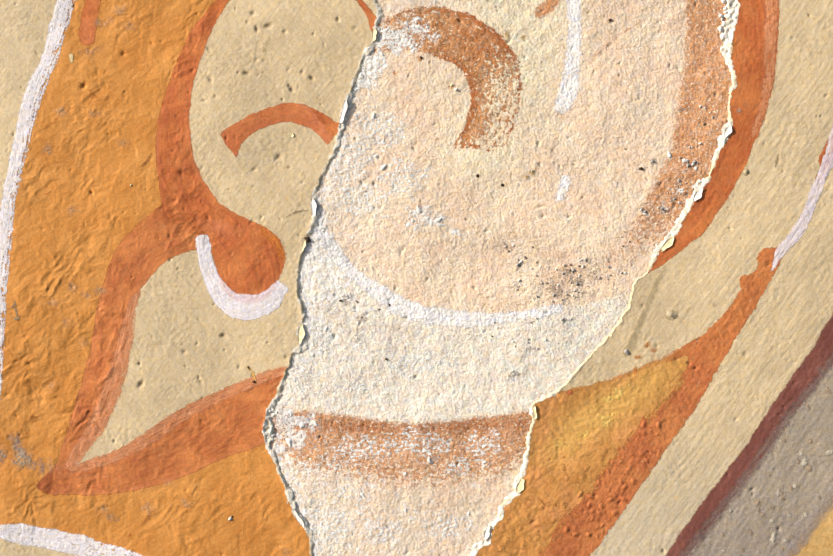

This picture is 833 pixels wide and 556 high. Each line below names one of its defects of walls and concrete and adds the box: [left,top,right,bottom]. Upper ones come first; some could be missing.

peeling [262,0,741,556]